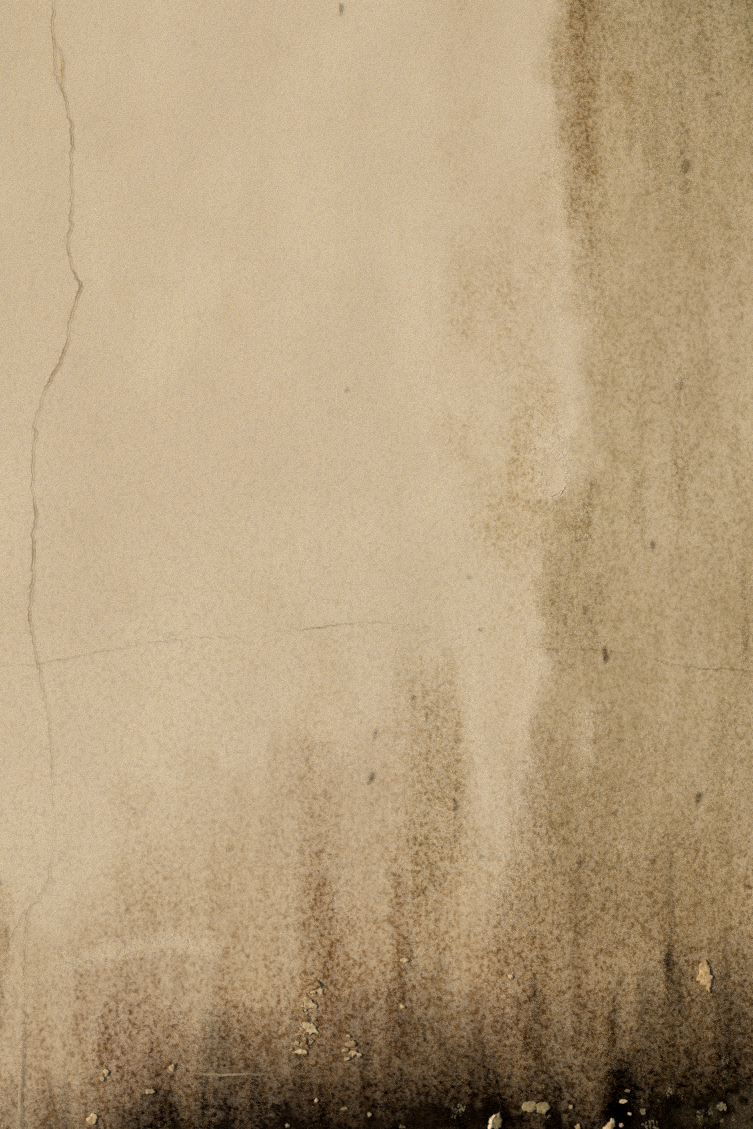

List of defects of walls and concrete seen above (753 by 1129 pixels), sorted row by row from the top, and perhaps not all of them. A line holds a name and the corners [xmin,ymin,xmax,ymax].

water stain [75,934,753,1129]
flaking render [488,1112,502,1129]
flaking render [522,1101,550,1114]
flaking render [603,1089,632,1129]